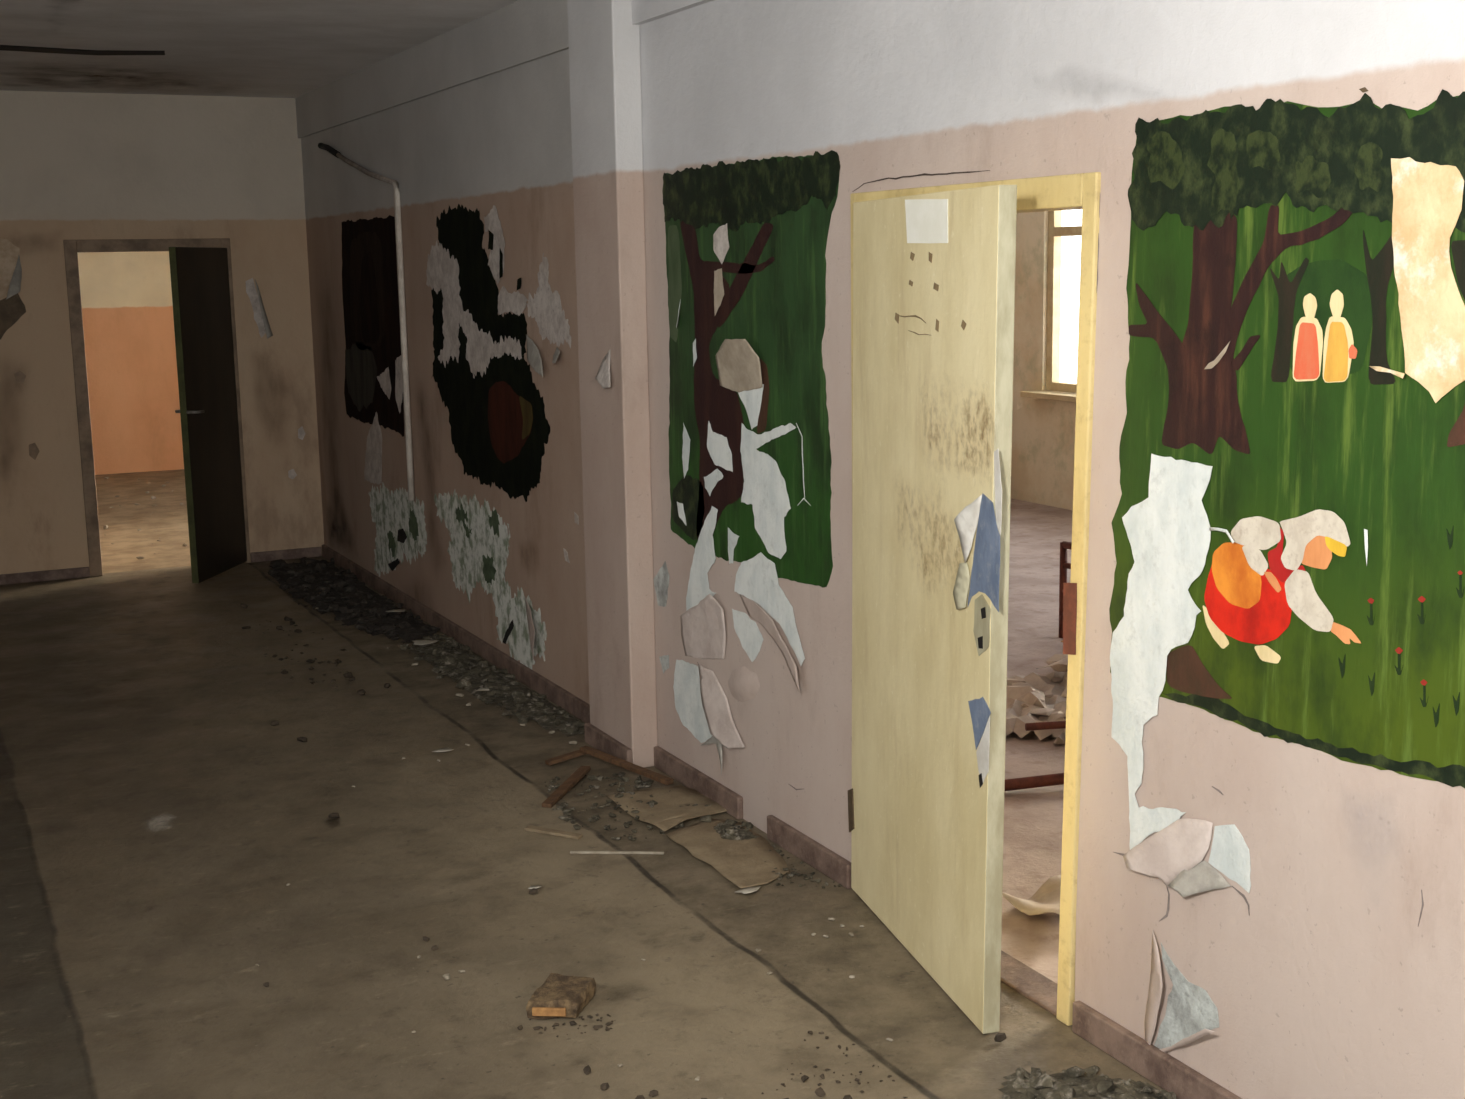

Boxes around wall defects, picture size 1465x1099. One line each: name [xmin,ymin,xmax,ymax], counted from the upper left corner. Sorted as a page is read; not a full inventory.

peeling [0,239,26,340]
peeling [246,278,273,339]
peeling [426,205,571,378]
peeling [1369,157,1465,403]
peeling [364,356,547,669]
peeling [654,561,669,607]
peeling [659,339,811,776]
peeling [1110,454,1251,1053]